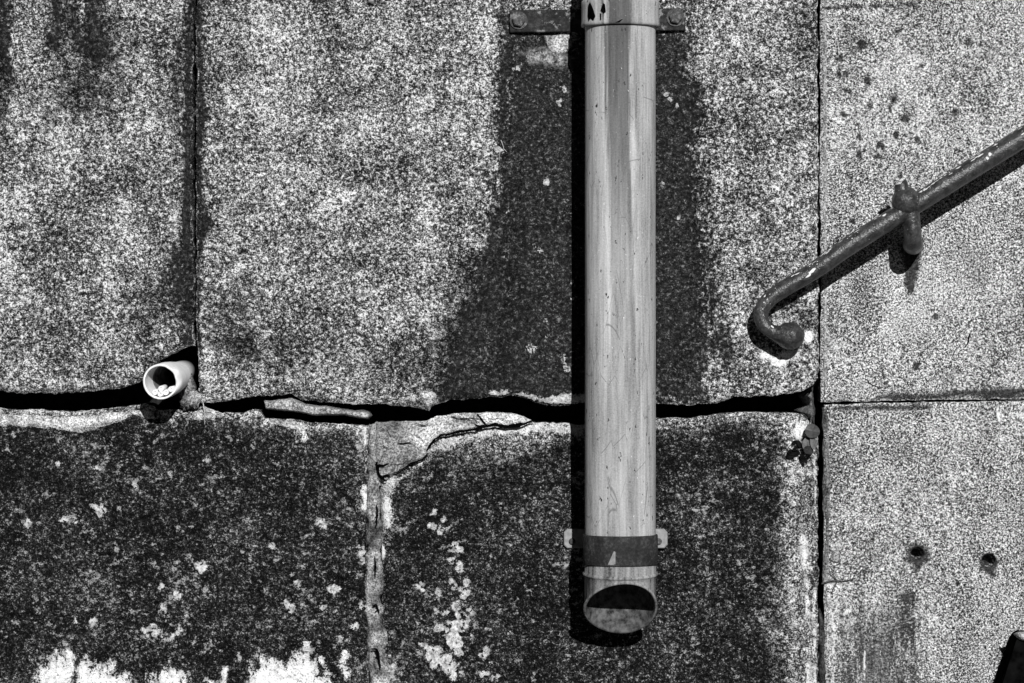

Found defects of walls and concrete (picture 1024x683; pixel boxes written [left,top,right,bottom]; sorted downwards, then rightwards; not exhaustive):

leakage [433,7,585,405]
leakage [787,422,806,439]
crack [375,414,535,527]
leakage [382,495,394,529]
leakage [32,645,132,683]
leakage [145,660,229,683]
leakage [242,641,352,683]